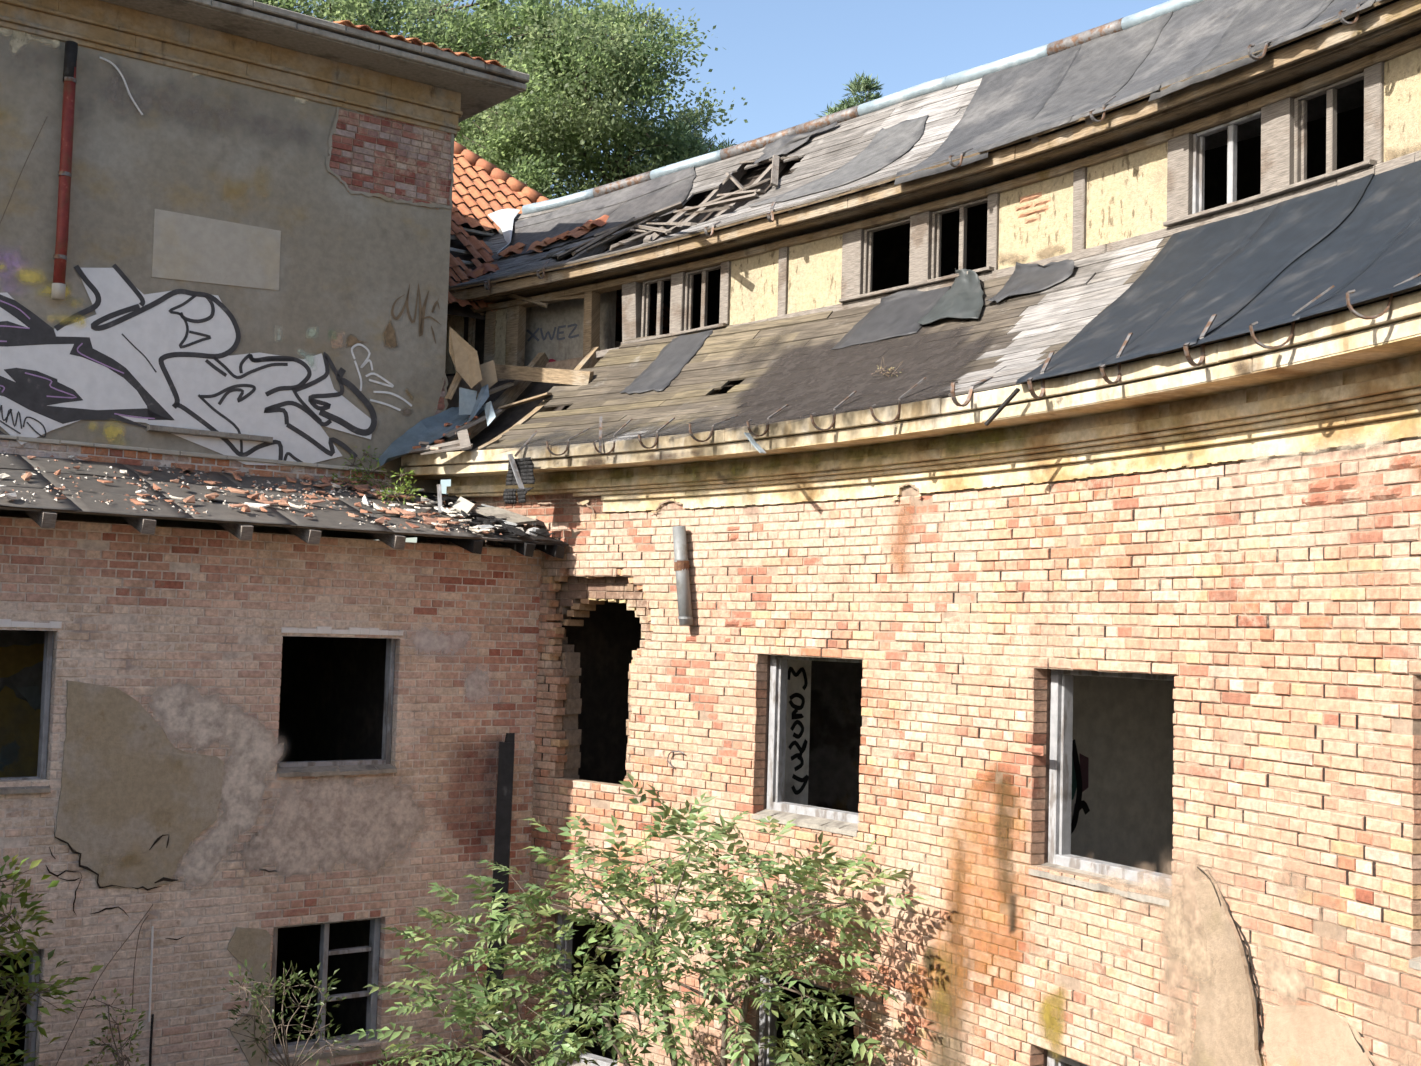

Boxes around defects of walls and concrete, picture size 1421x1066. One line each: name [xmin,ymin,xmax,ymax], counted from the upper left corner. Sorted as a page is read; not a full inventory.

peeling [0,28,60,53]
spalling [326,106,455,210]
damp [933,429,1025,450]
spalling [546,568,655,665]
damp [1041,992,1063,1049]